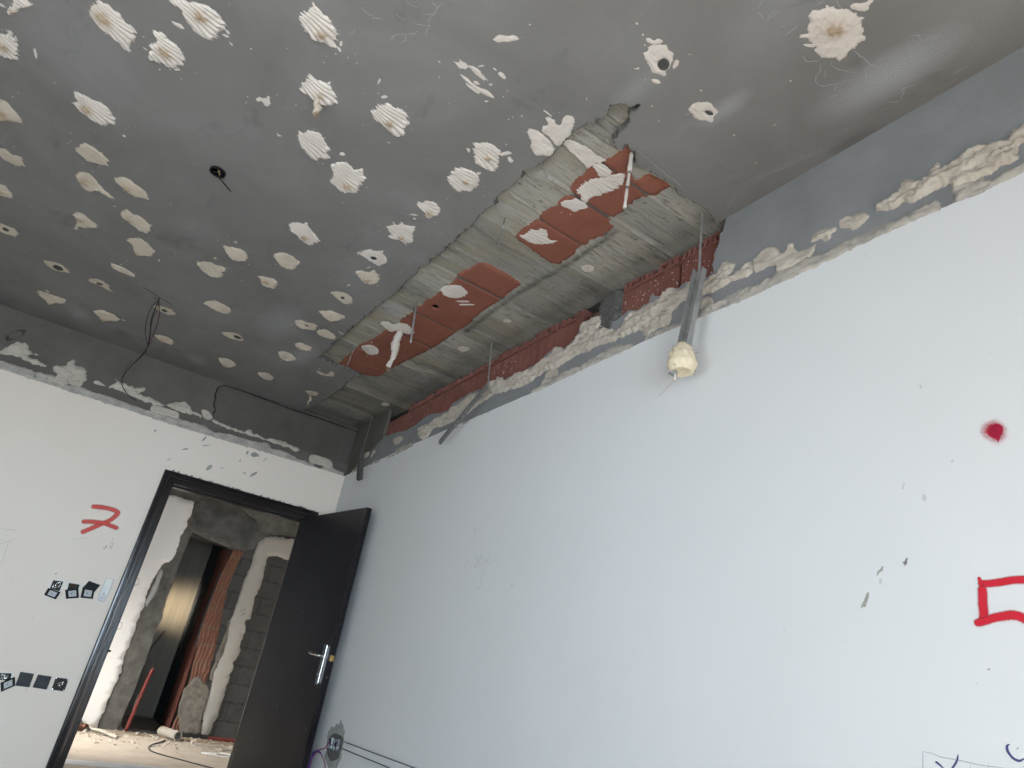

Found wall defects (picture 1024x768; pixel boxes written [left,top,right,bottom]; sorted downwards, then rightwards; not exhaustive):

spalling [398,105,611,292]
spalling [612,103,650,173]
spalling [213,301,385,464]